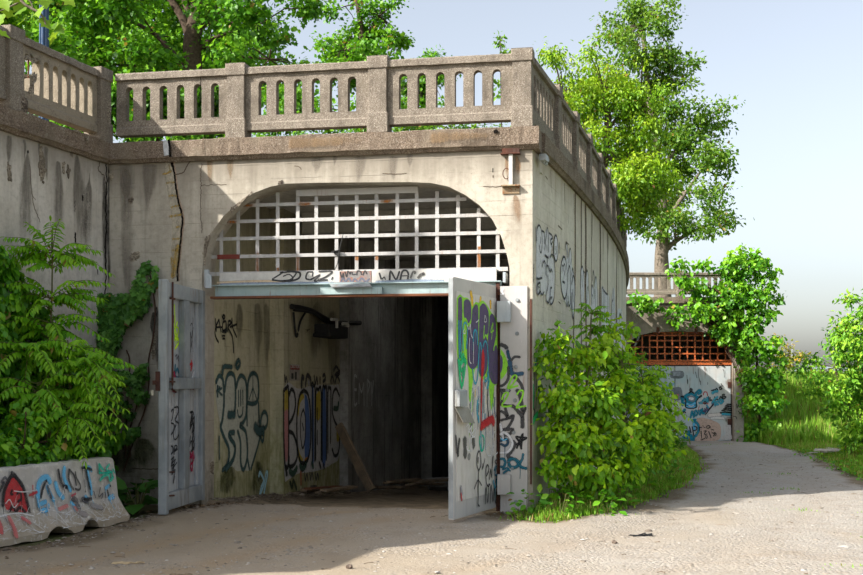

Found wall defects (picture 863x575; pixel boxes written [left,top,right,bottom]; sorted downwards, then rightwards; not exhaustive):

damp [71,154,91,229]
damp [102,168,110,279]
crack [168,137,227,281]